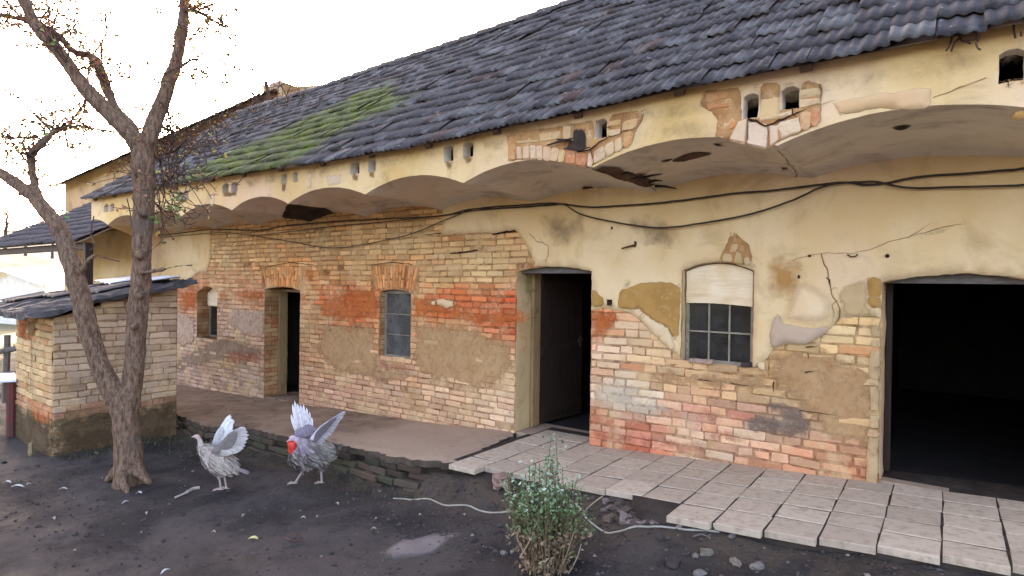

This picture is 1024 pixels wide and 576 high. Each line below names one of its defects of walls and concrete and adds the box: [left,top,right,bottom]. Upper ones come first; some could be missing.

spalling [507,81,822,189]
flaking render [177,204,534,433]
spalling [720,235,752,265]
crack [796,224,961,324]
flaking render [590,277,882,481]
damp [748,403,808,436]